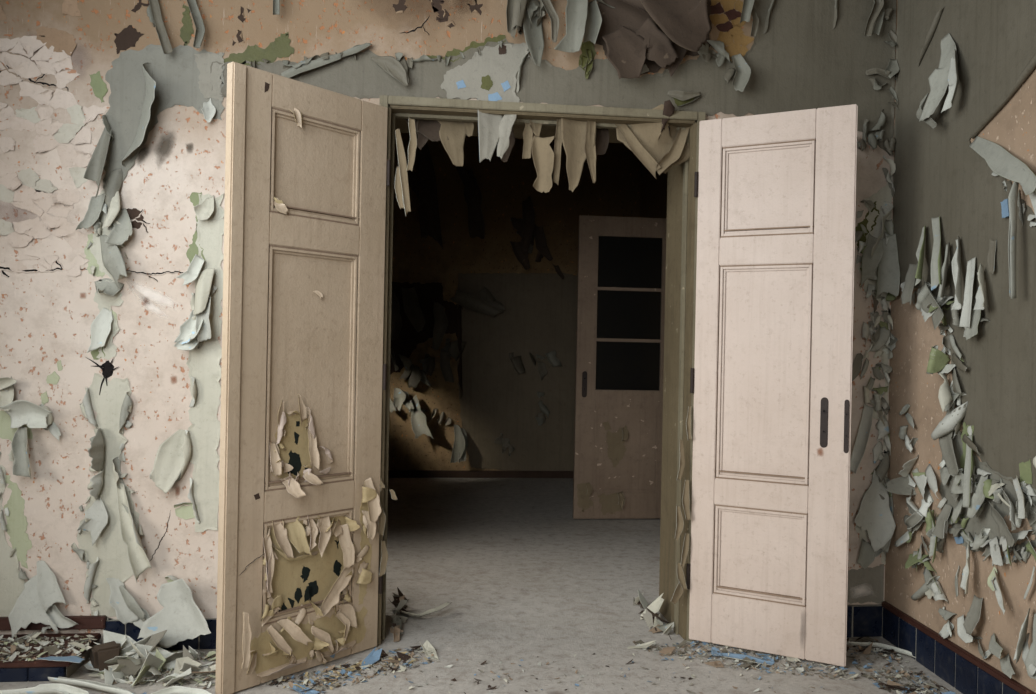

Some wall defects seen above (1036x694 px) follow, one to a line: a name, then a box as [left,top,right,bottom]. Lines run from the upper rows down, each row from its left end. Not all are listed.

spalling [232,7,251,46]
crack [0,61,72,97]
peeling [0,0,231,648]
peeling [242,0,1036,680]
peeling [269,640,439,694]
peeling [873,649,956,694]